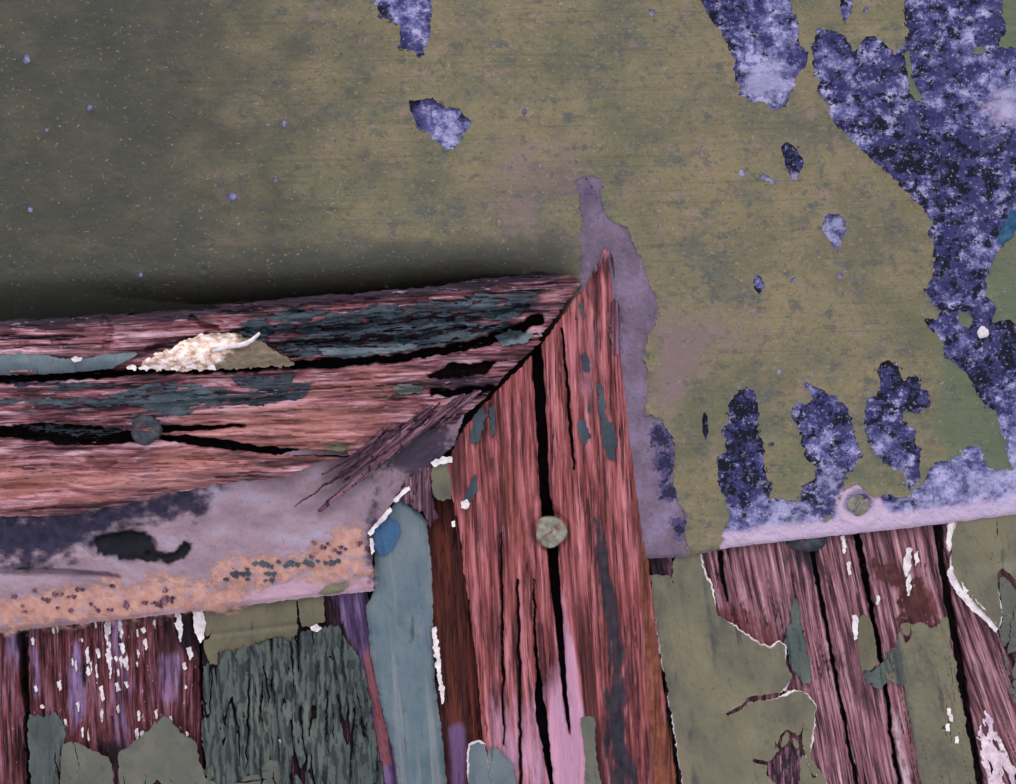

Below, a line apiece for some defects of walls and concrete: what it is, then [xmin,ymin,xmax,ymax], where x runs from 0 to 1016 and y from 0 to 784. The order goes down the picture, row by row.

peeling [374,0,432,58]
peeling [409,97,471,150]
peeling [13,424,122,438]
peeling [0,291,540,417]
crack [0,314,575,517]
peeling [470,405,495,444]
peeling [575,175,827,784]
peeling [701,0,1016,703]
rust [0,525,373,636]
peeling [27,581,384,784]
crack [500,533,570,784]
peeling [852,613,1016,784]